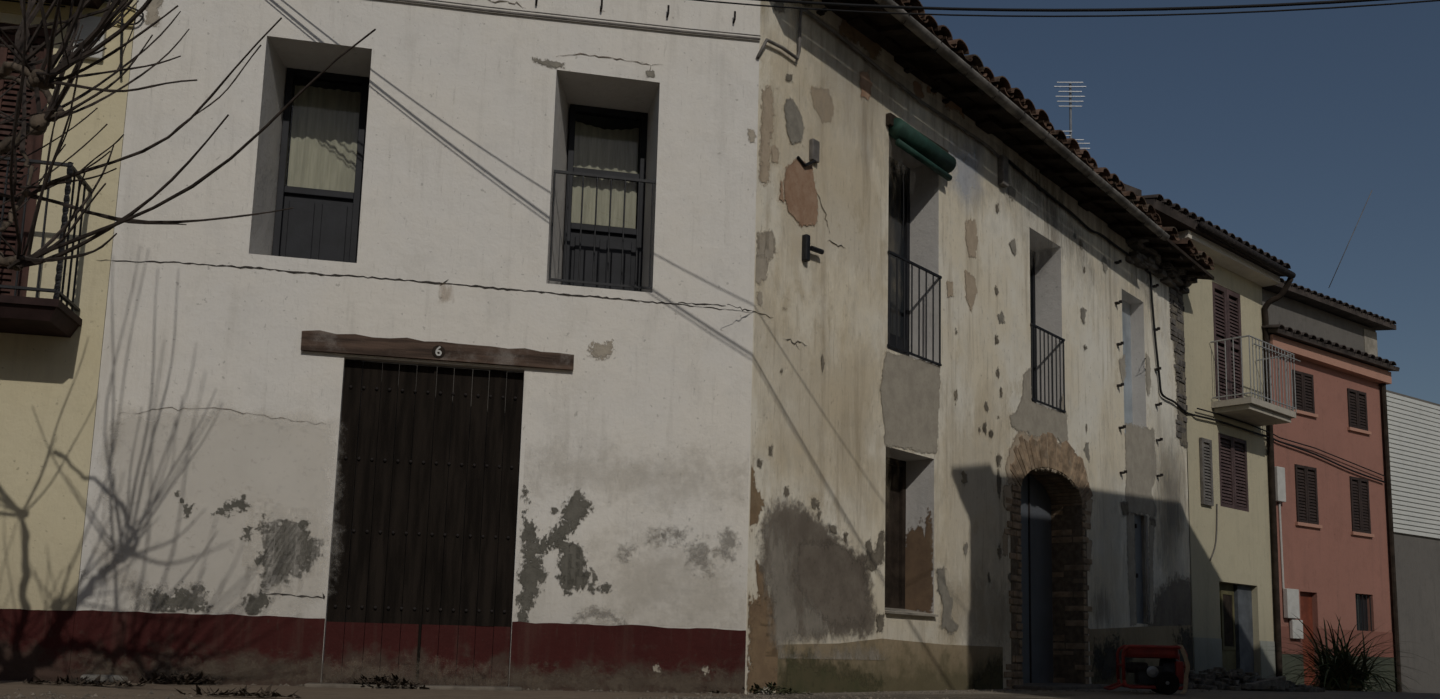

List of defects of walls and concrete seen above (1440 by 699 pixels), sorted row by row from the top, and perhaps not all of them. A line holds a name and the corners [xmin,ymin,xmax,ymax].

flaking render [747,74,834,227]
peeling [175,490,196,517]
peeling [211,494,328,614]
peeling [515,485,612,622]
peeling [750,444,773,532]
peeling [811,498,848,542]
peeling [747,560,778,694]